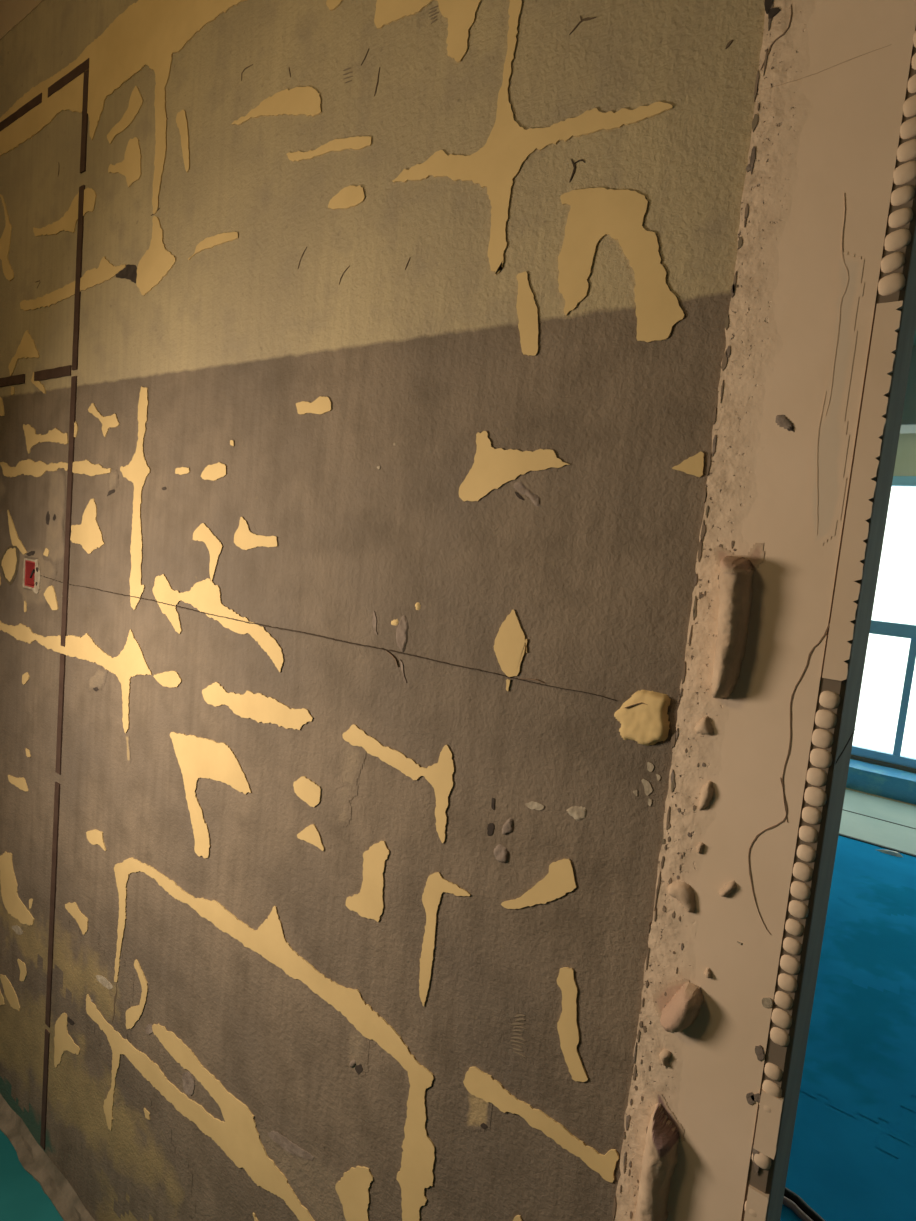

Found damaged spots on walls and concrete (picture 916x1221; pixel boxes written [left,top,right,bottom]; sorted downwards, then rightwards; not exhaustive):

peeling [0,0,247,311]
peeling [0,386,284,672]
peeling [459,431,570,506]
peeling [0,601,182,733]
peeling [202,682,313,730]
crack [40,575,617,701]
peeling [614,662,687,753]
peeling [170,732,252,858]
peeling [342,724,455,843]
peeling [346,841,390,922]
peeling [86,857,436,1221]
peeling [463,948,667,1221]